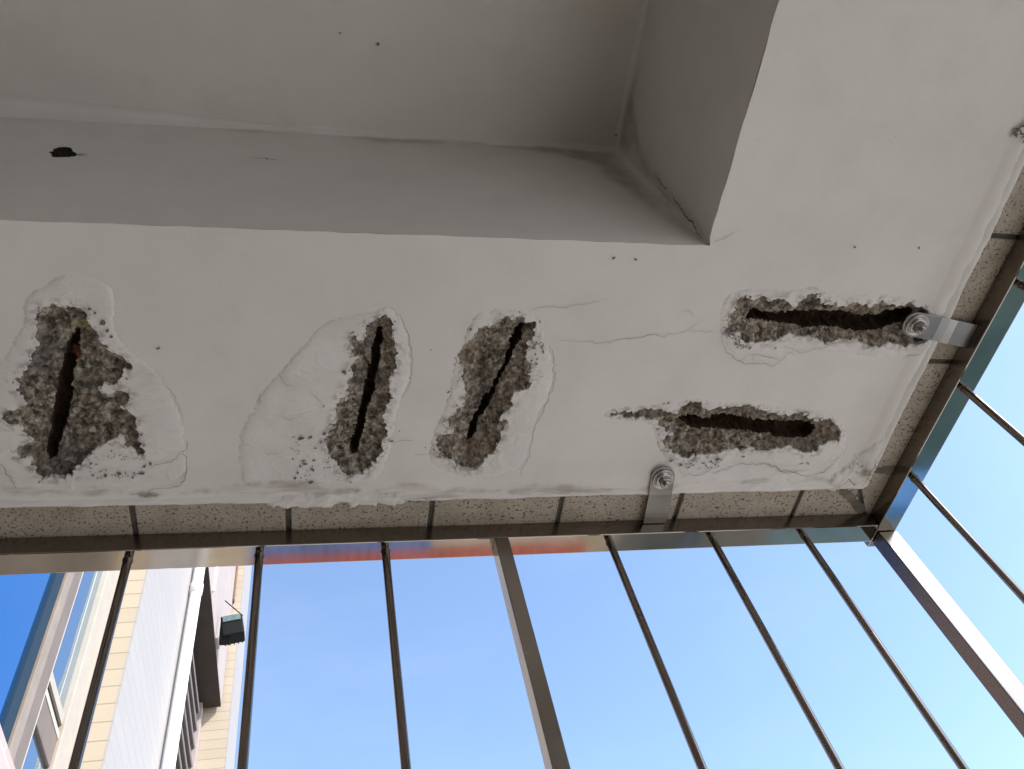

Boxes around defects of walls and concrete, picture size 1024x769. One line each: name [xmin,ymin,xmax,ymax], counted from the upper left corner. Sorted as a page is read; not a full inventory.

spalling [0,274,188,489]